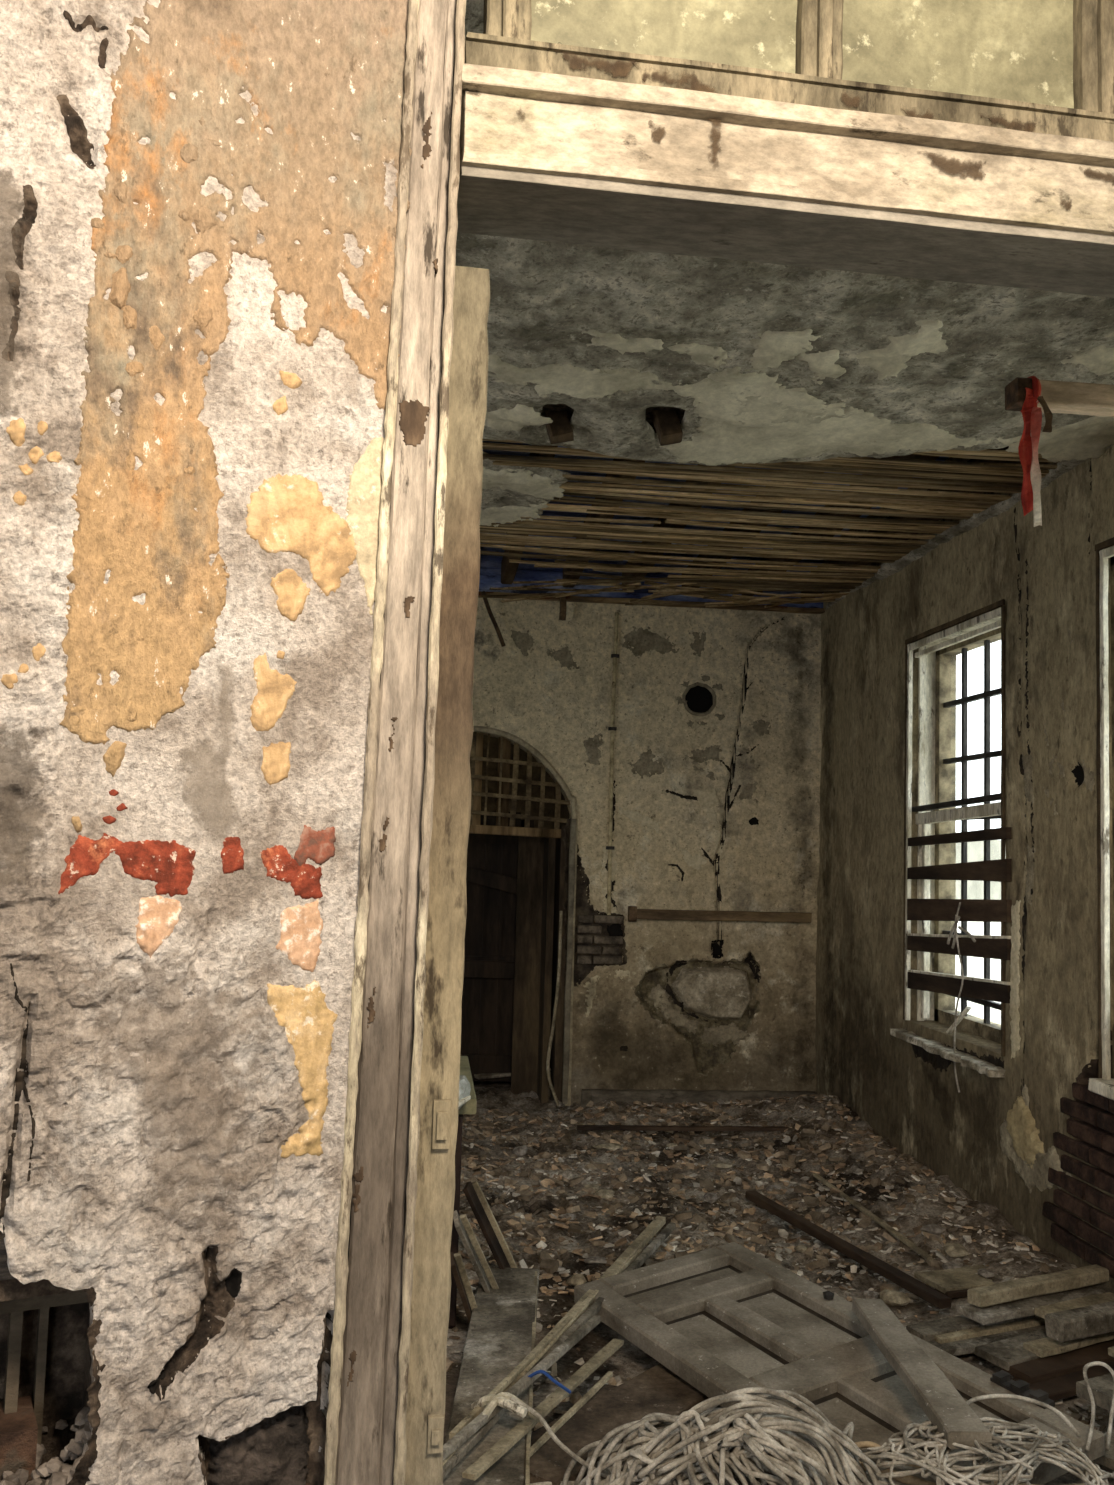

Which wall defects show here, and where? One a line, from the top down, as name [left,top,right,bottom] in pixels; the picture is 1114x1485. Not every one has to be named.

peeling [1,0,432,745]
peeling [480,466,565,527]
peeling [486,320,1114,466]
peeling [250,650,297,785]
peeling [379,816,389,852]
spalling [562,749,761,1077]
peeling [622,626,706,659]
crack [666,617,784,941]
crack [0,963,36,1239]
spalling [1042,1030,1114,1279]
spalling [0,1238,106,1485]
spalling [198,1312,357,1485]